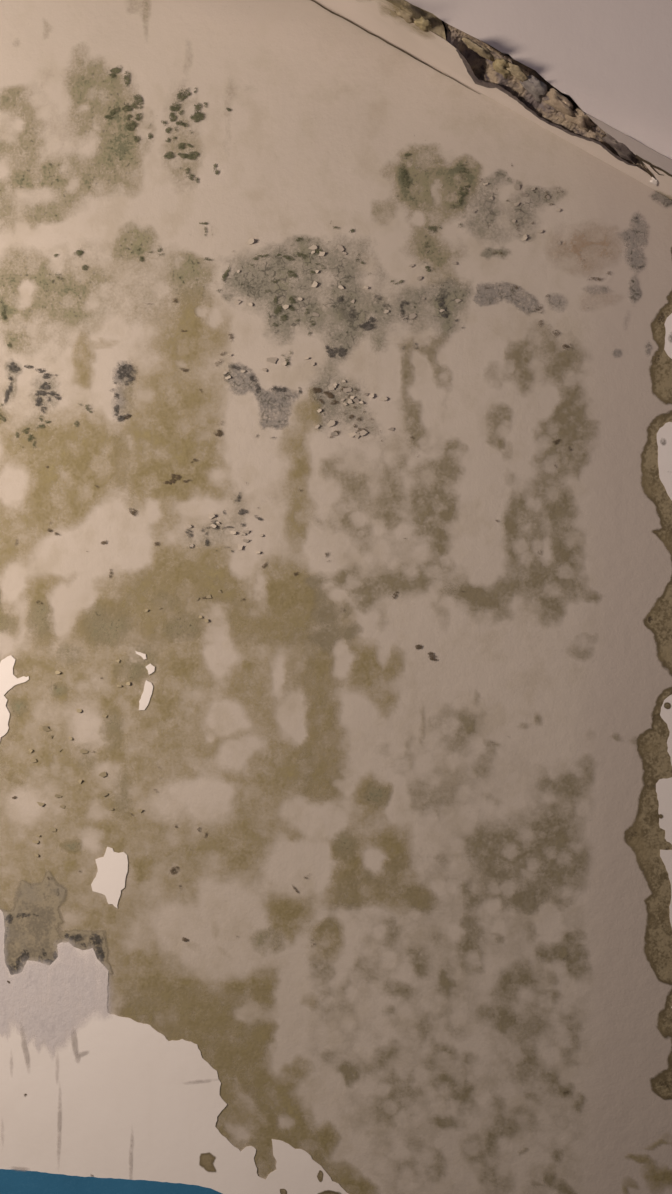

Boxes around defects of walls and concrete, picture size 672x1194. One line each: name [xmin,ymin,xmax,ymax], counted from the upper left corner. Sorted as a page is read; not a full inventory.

leakage [0,59,207,223]
crack [311,0,479,94]
crack [636,155,672,180]
leakage [448,320,599,619]
peeling [641,291,672,561]
peeling [0,655,29,741]
leakage [0,147,561,1194]
peeling [91,847,128,908]
leakage [458,763,592,968]
peeling [624,576,672,1100]
peeling [0,871,349,1194]
leakage [479,932,586,1111]